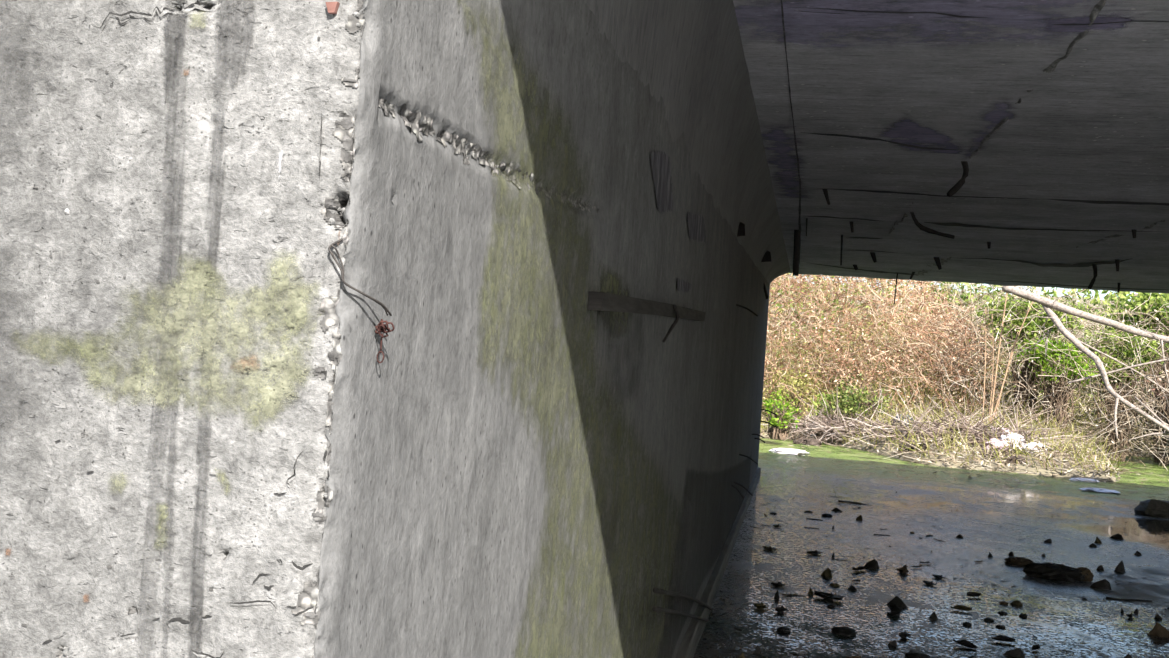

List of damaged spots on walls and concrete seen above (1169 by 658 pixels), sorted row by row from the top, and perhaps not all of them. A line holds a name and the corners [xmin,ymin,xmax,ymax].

crack [91,0,220,34]
damp [165,0,185,94]
damp [218,0,254,88]
damp [735,0,1130,47]
spalling [379,99,599,213]
crack [781,0,1169,290]
damp [156,177,182,555]
damp [189,595,202,656]